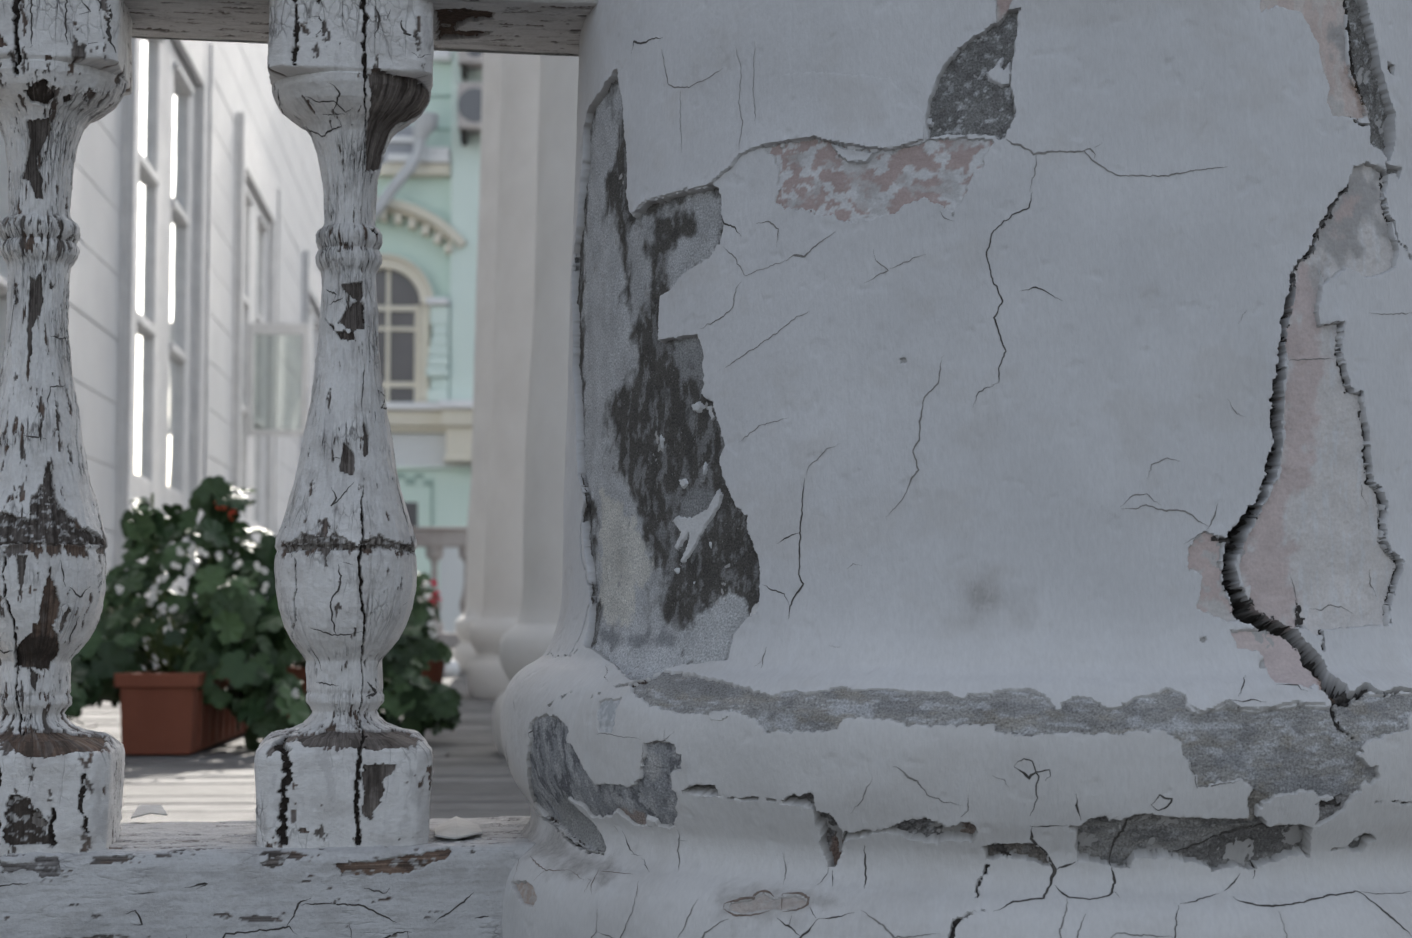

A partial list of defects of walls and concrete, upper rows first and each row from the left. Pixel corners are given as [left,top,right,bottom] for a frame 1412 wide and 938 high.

peeling [364,70,429,172]
crack [975,139,1228,401]
flaking render [577,0,1412,867]
crack [1123,176,1396,739]
crack [0,552,25,736]
peeling [17,567,71,691]
peeling [0,795,61,878]
crack [44,773,88,845]
crack [273,737,293,845]
peeling [298,731,417,820]
flaking render [530,716,682,854]
crack [678,758,1410,938]